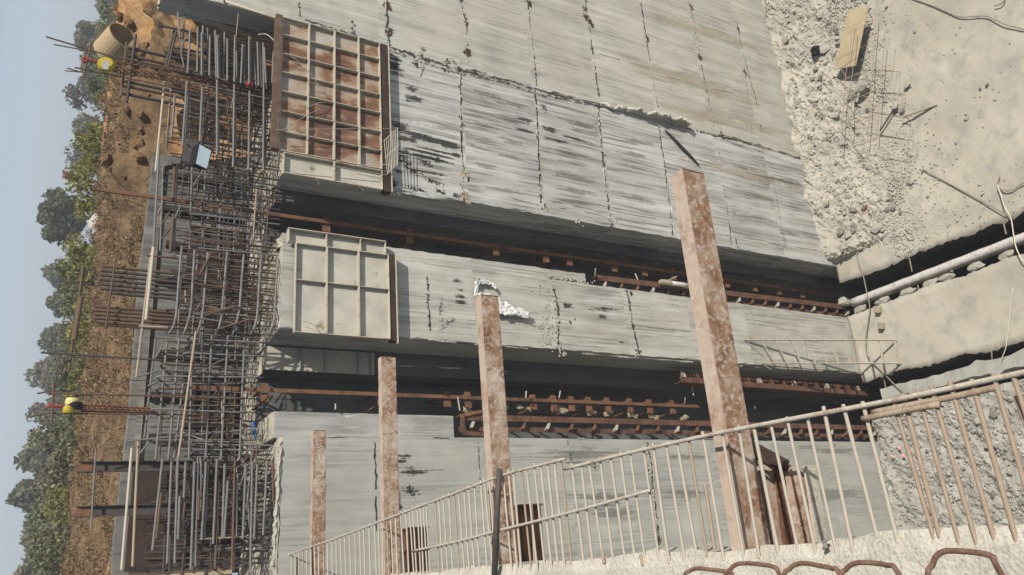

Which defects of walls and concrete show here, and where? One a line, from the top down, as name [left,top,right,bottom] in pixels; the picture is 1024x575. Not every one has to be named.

crack [298,0,800,247]
spalling [600,102,692,125]
crack [626,290,686,357]